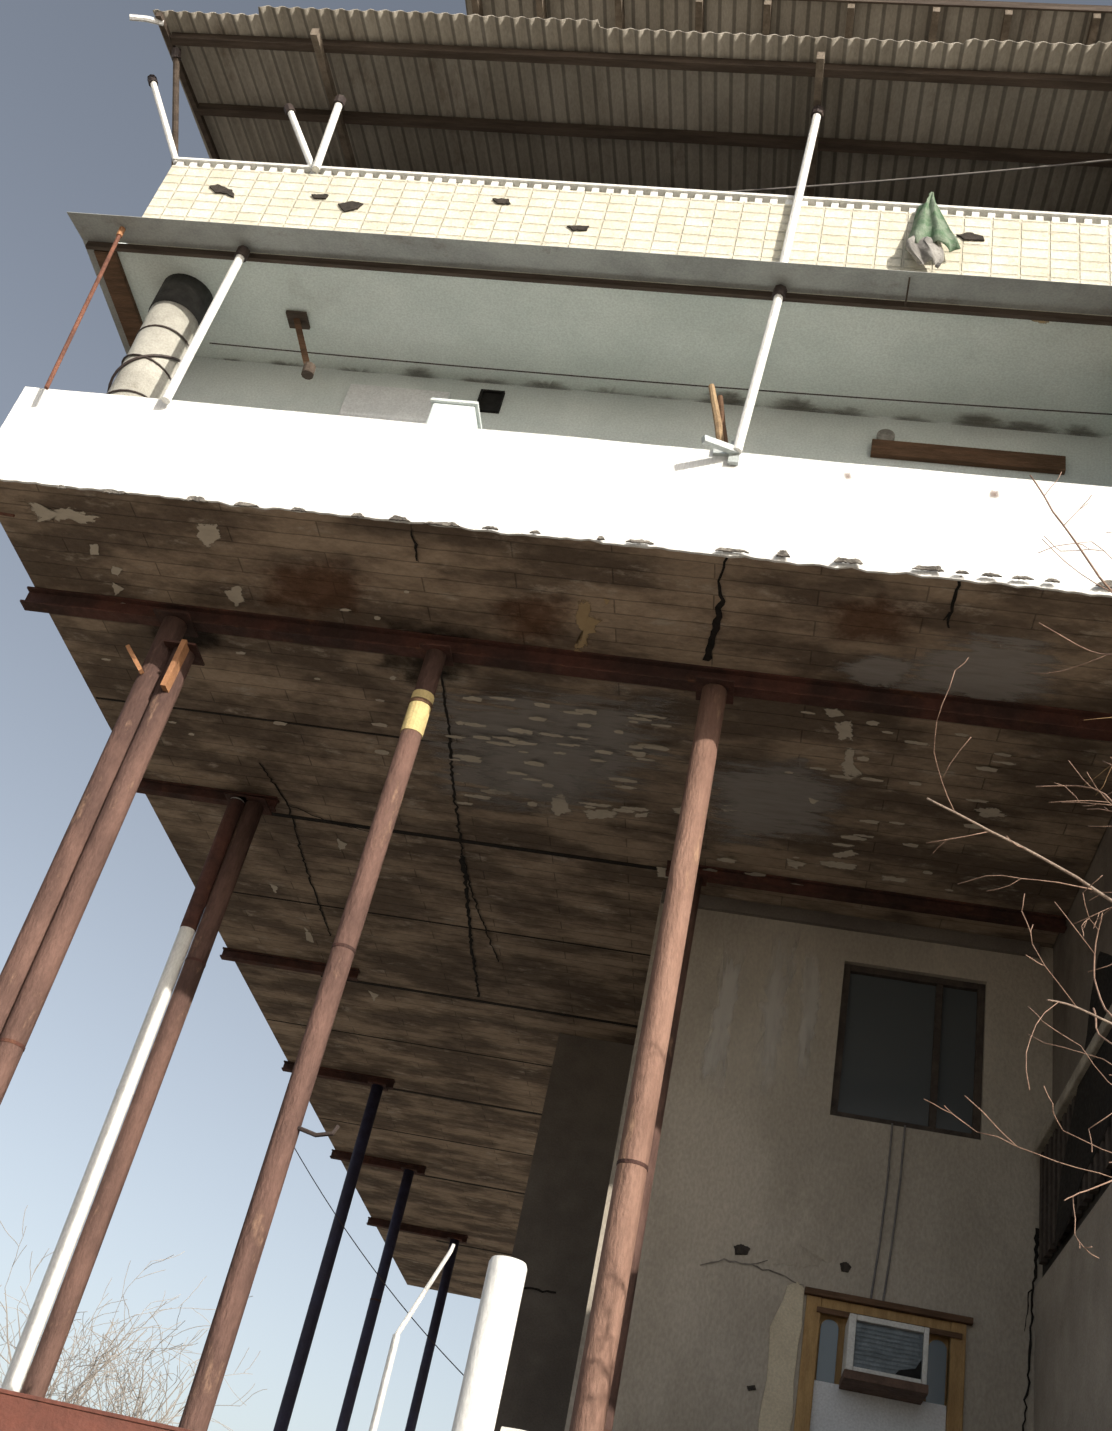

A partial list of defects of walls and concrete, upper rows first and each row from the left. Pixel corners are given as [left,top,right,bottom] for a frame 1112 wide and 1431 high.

spalling [209,184,234,198]
spalling [311,194,363,212]
peeling [30,502,99,524]
spalling [834,557,863,565]
spalling [912,565,1060,583]
crack [702,558,728,661]
crack [943,576,962,628]
peeling [445,703,672,819]
peeling [801,709,929,782]
crack [440,672,499,997]
crack [1022,951,1112,1431]
crack [700,1258,804,1286]